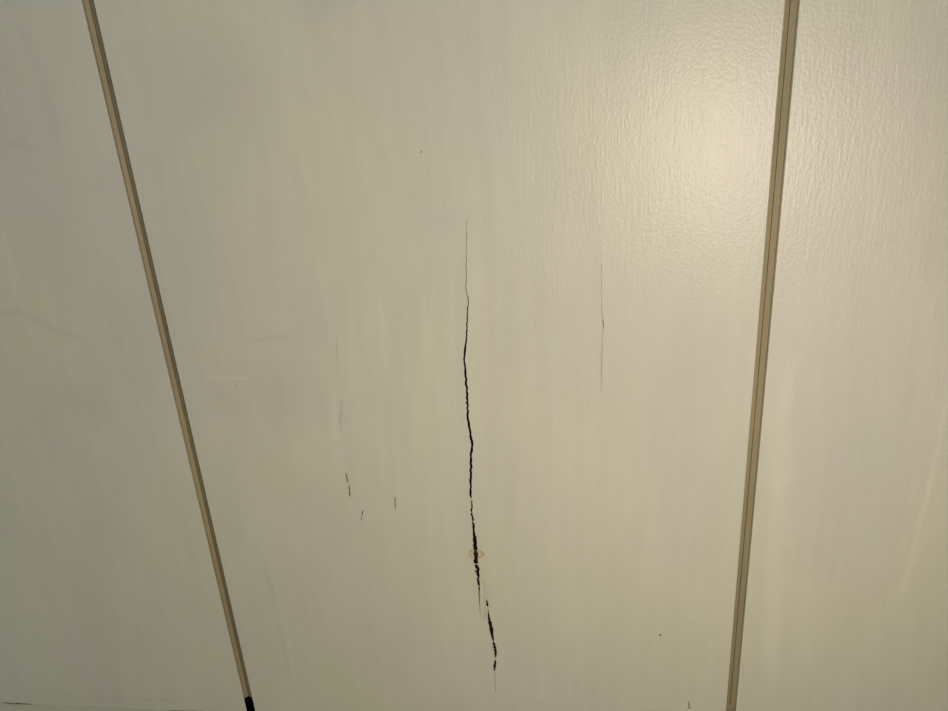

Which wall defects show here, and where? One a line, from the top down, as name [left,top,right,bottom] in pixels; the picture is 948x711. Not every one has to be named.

crack [463,220,497,671]